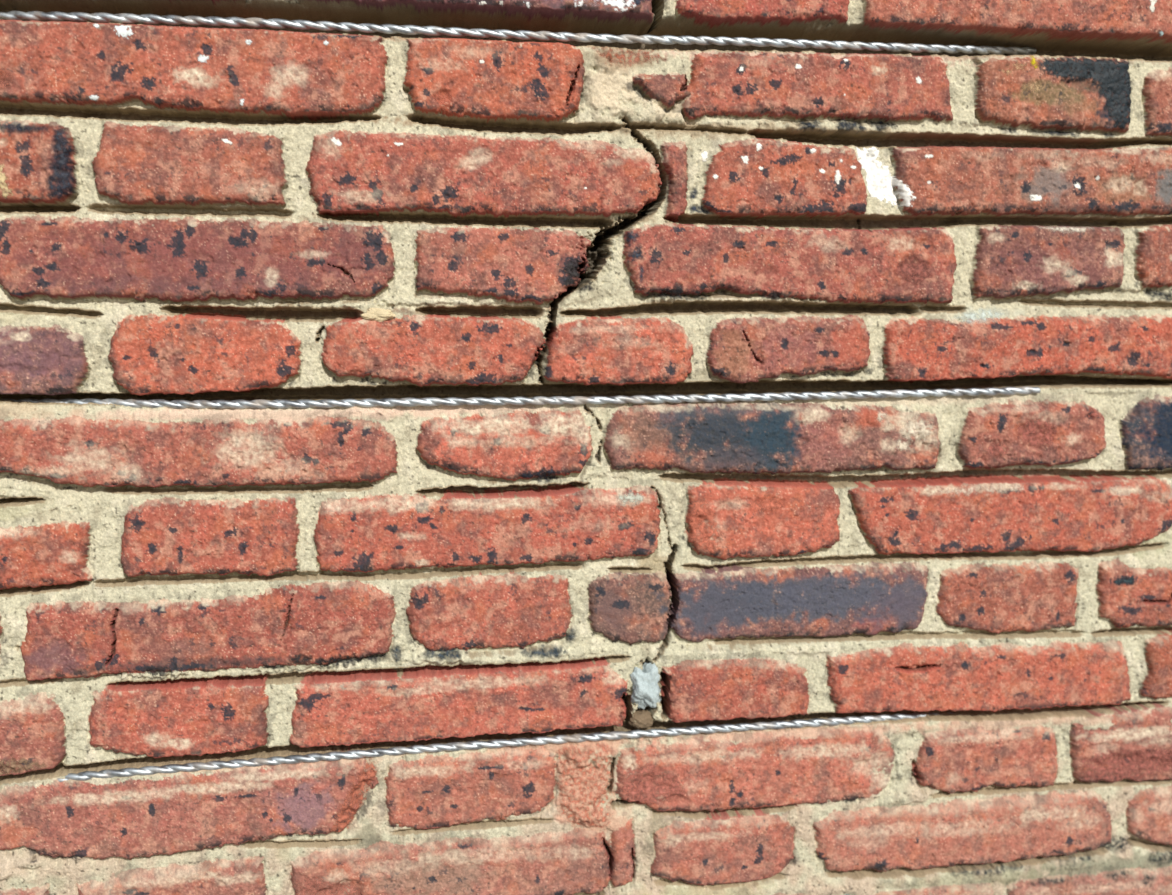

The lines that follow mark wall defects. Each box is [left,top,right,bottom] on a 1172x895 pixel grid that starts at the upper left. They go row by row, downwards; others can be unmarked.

crack [647,0,665,34]
crack [566,65,580,106]
crack [680,75,688,91]
crack [535,117,668,384]
crack [584,405,603,463]
crack [620,486,680,730]